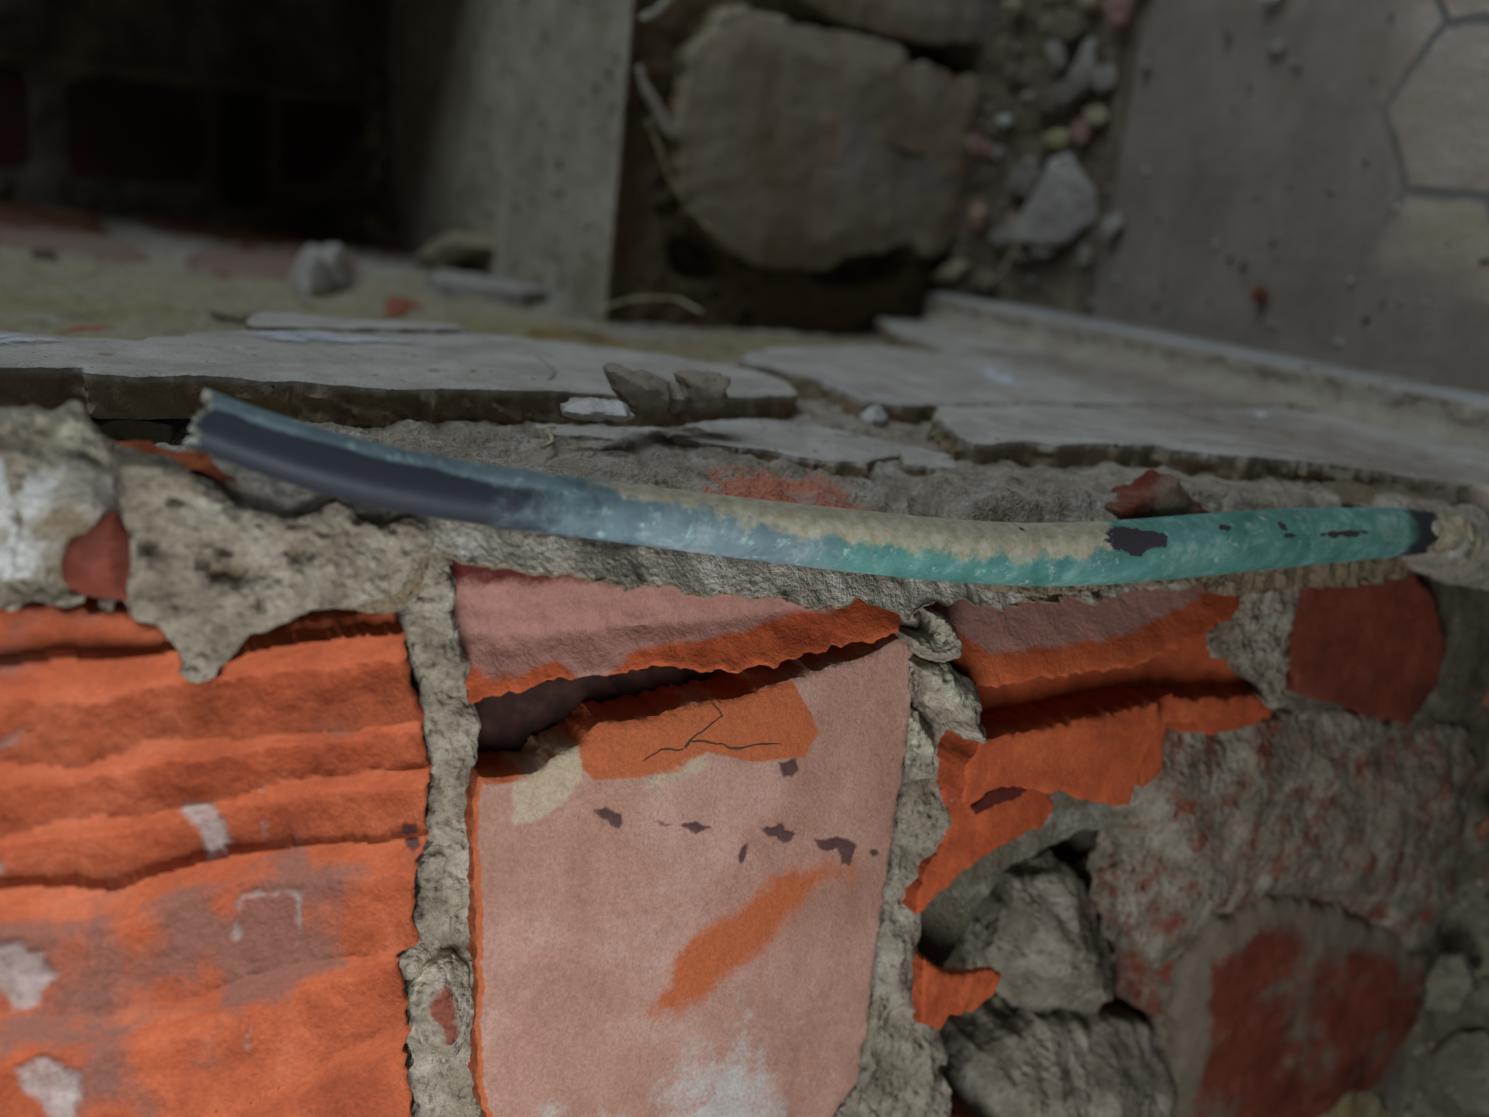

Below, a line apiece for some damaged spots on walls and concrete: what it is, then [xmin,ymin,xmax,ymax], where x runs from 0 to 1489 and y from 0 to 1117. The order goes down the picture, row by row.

flaking render [115,441,236,484]
spalling [0,459,1489,1117]